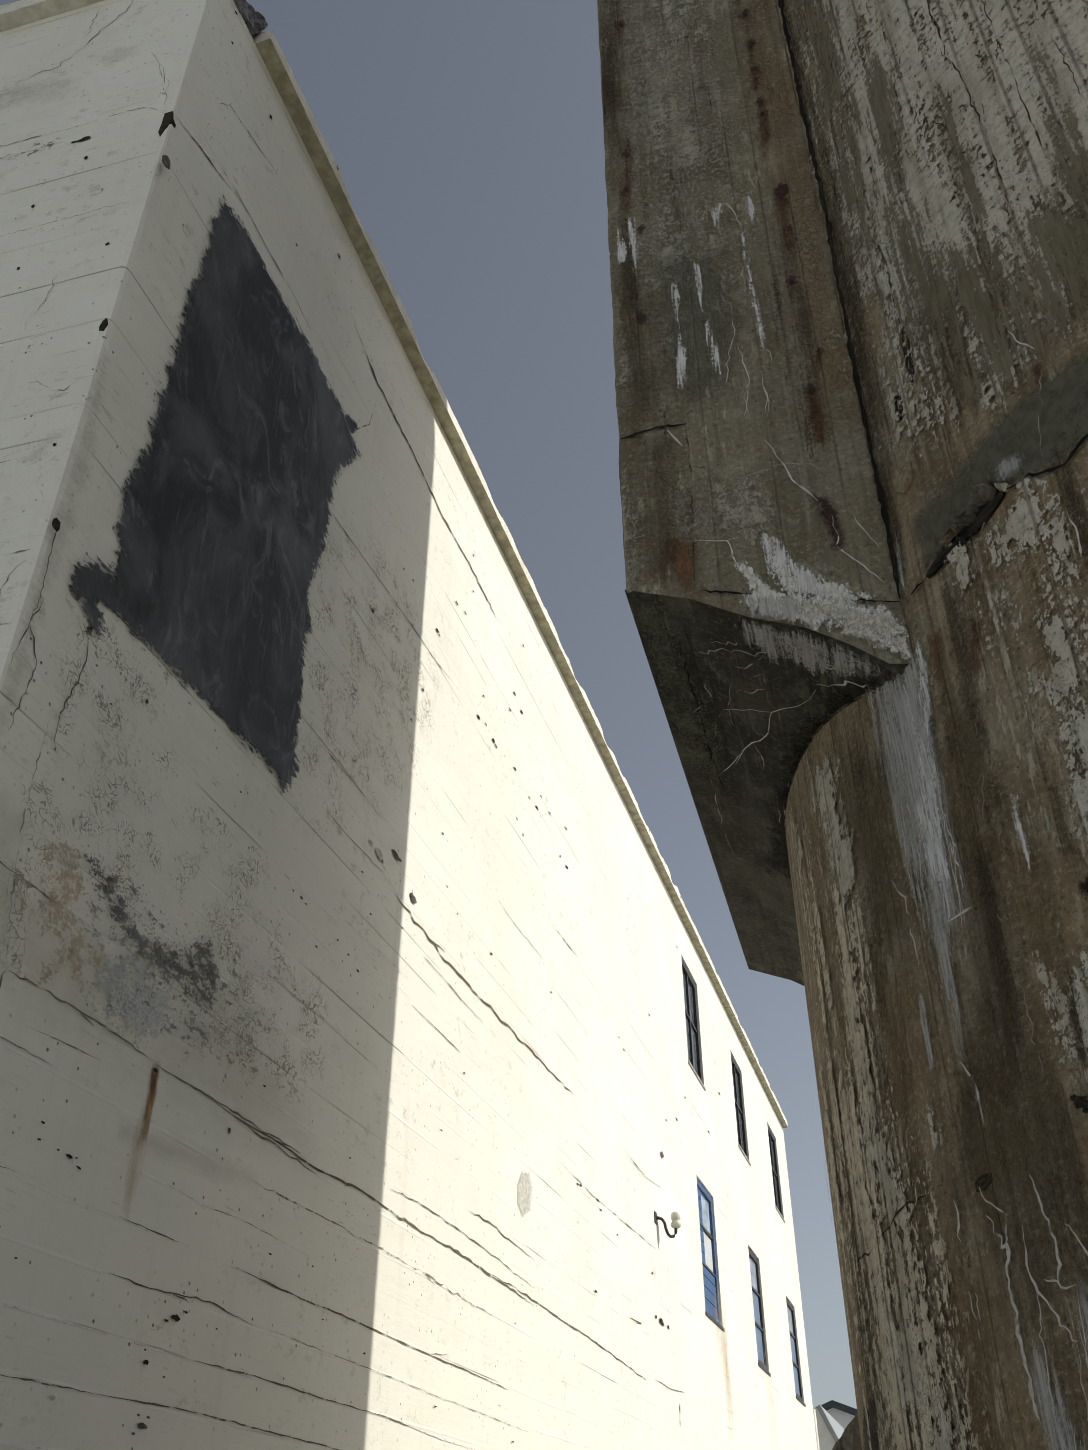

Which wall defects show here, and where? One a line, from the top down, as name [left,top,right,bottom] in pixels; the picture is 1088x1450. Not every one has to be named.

crack [355,329,494,613]
damp [671,284,687,394]
peeling [606,0,756,313]
corrosion [745,39,768,149]
corrosion [774,183,789,236]
peeling [784,0,1088,494]
damp [784,0,1088,754]
corrosion [143,1068,158,1136]
crack [0,511,685,1434]
damp [734,533,1031,1102]
peeling [784,754,994,1450]
crack [0,1374,339,1450]